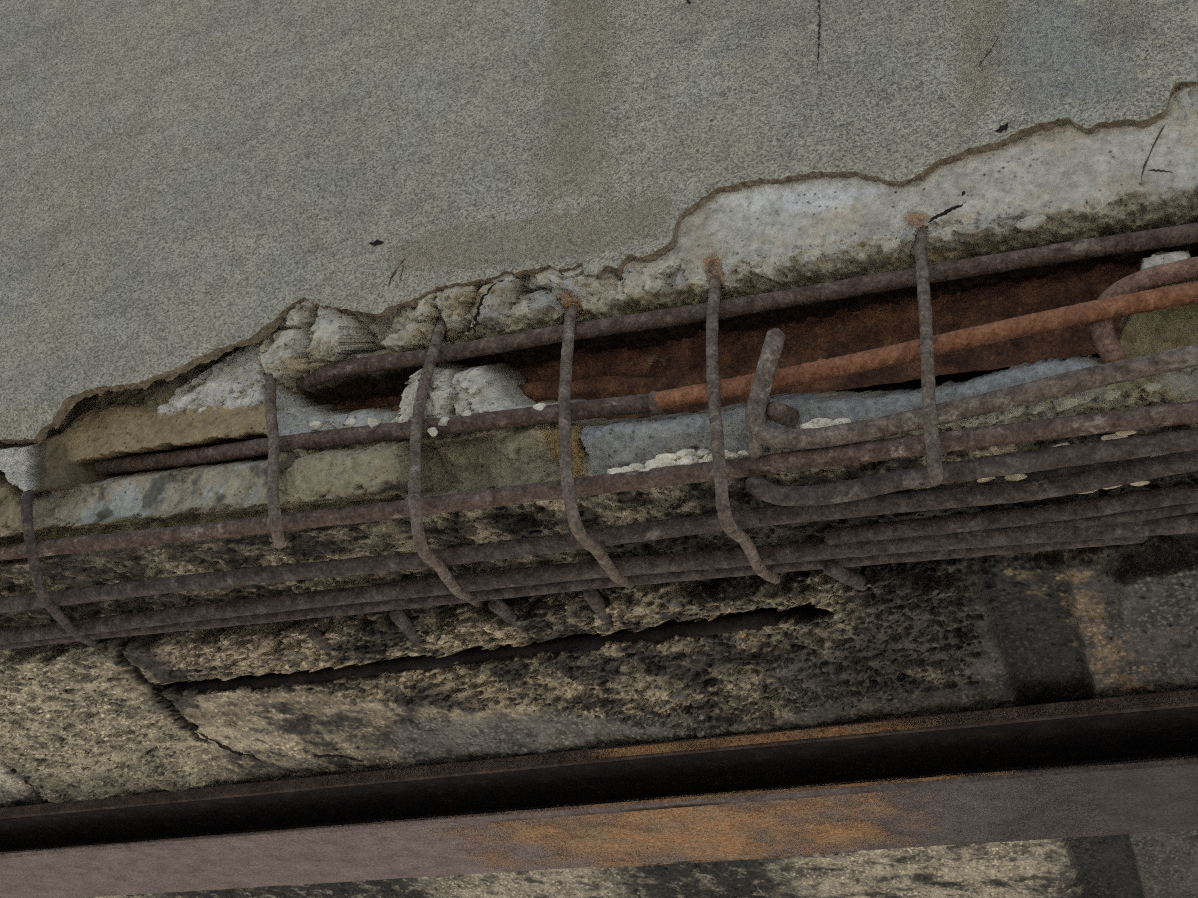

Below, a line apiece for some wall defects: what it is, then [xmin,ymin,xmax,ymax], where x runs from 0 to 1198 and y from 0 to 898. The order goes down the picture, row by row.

crack [815,0,823,80]
spalling [0,81,1198,738]
crack [111,637,265,764]
corrosion [597,721,913,757]
corrosion [479,775,957,867]